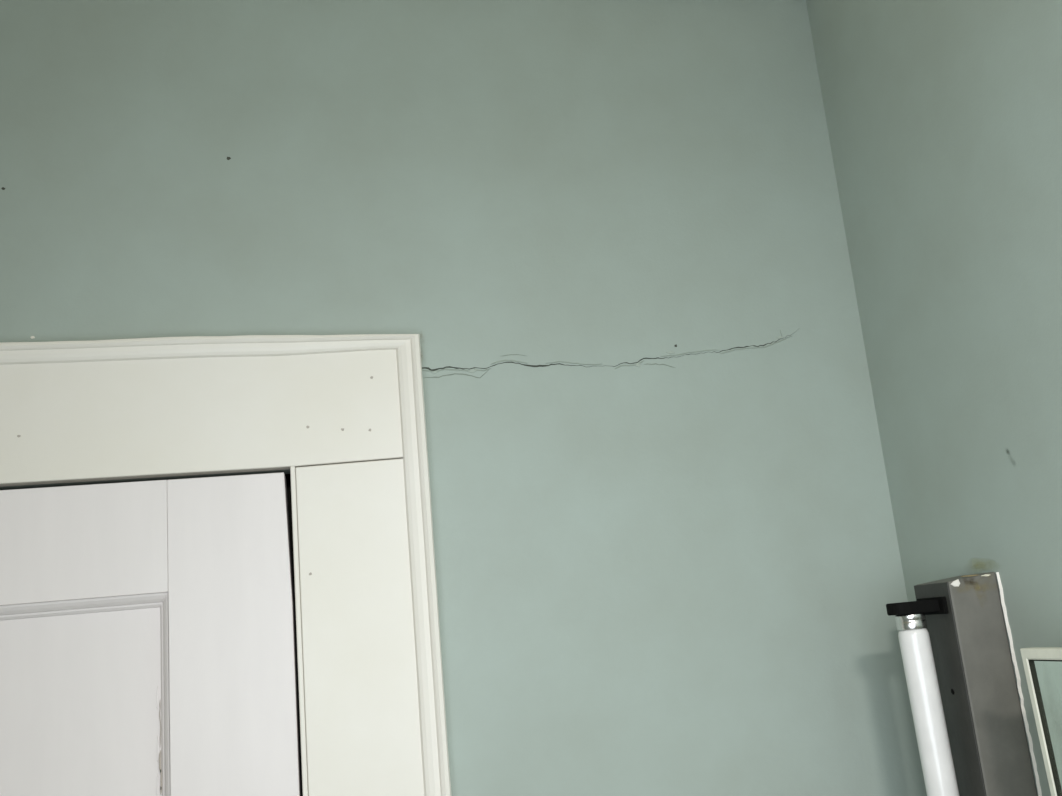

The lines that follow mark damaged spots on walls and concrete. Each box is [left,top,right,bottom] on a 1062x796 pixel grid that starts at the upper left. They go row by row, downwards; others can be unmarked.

crack [422,330,795,378]